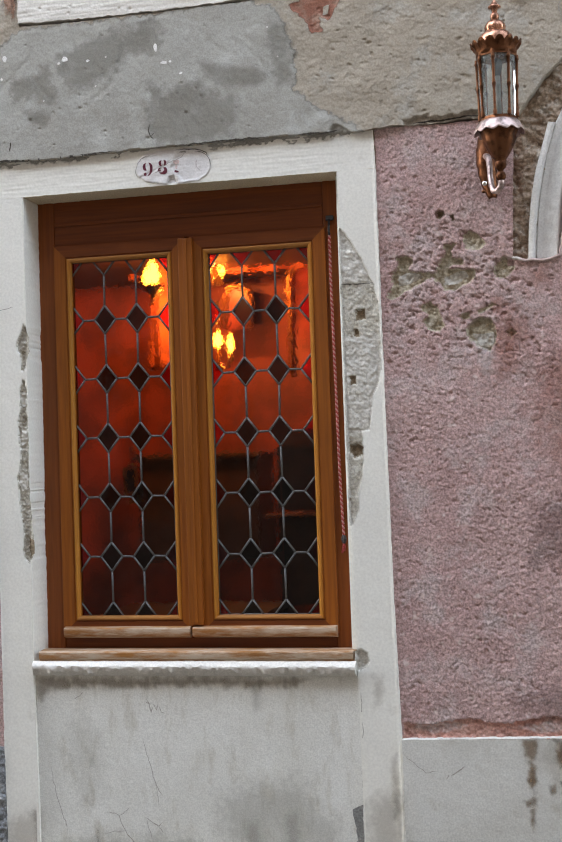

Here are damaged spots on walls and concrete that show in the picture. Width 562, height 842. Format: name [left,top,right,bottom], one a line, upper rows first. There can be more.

peeling [288,0,339,33]
flaking render [460,302,516,351]
peeling [339,228,486,526]
peeling [16,324,35,564]
crack [110,742,163,842]